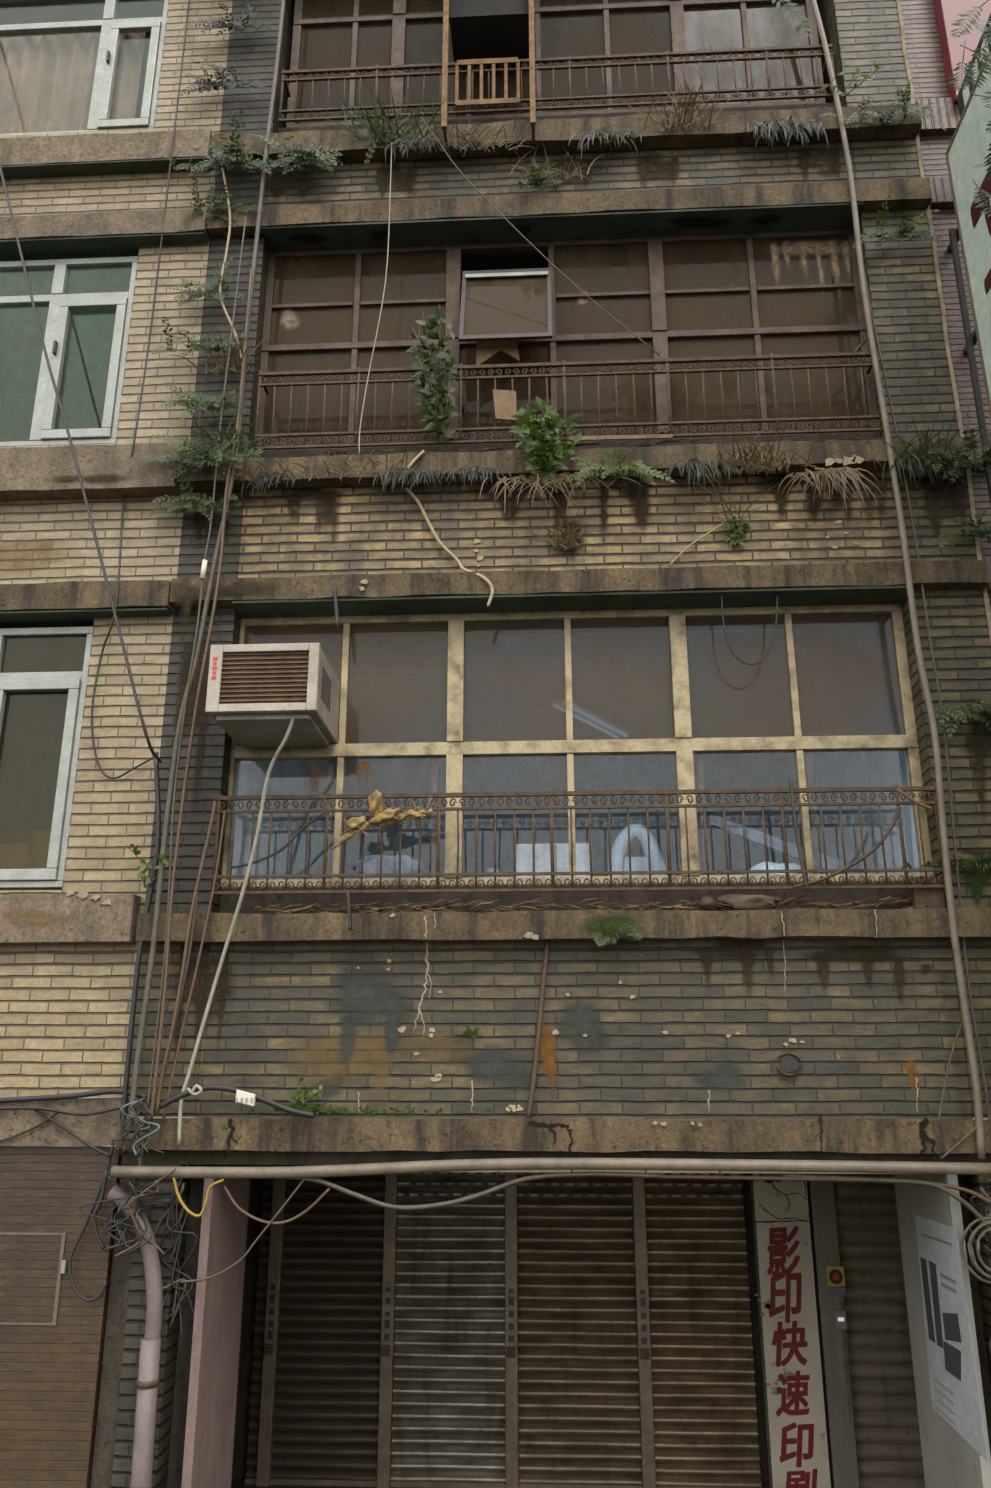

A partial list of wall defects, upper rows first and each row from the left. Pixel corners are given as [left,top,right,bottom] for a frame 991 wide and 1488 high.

water stain [771,242,850,278]
water stain [702,940,773,988]
rust [539,1029,555,1078]